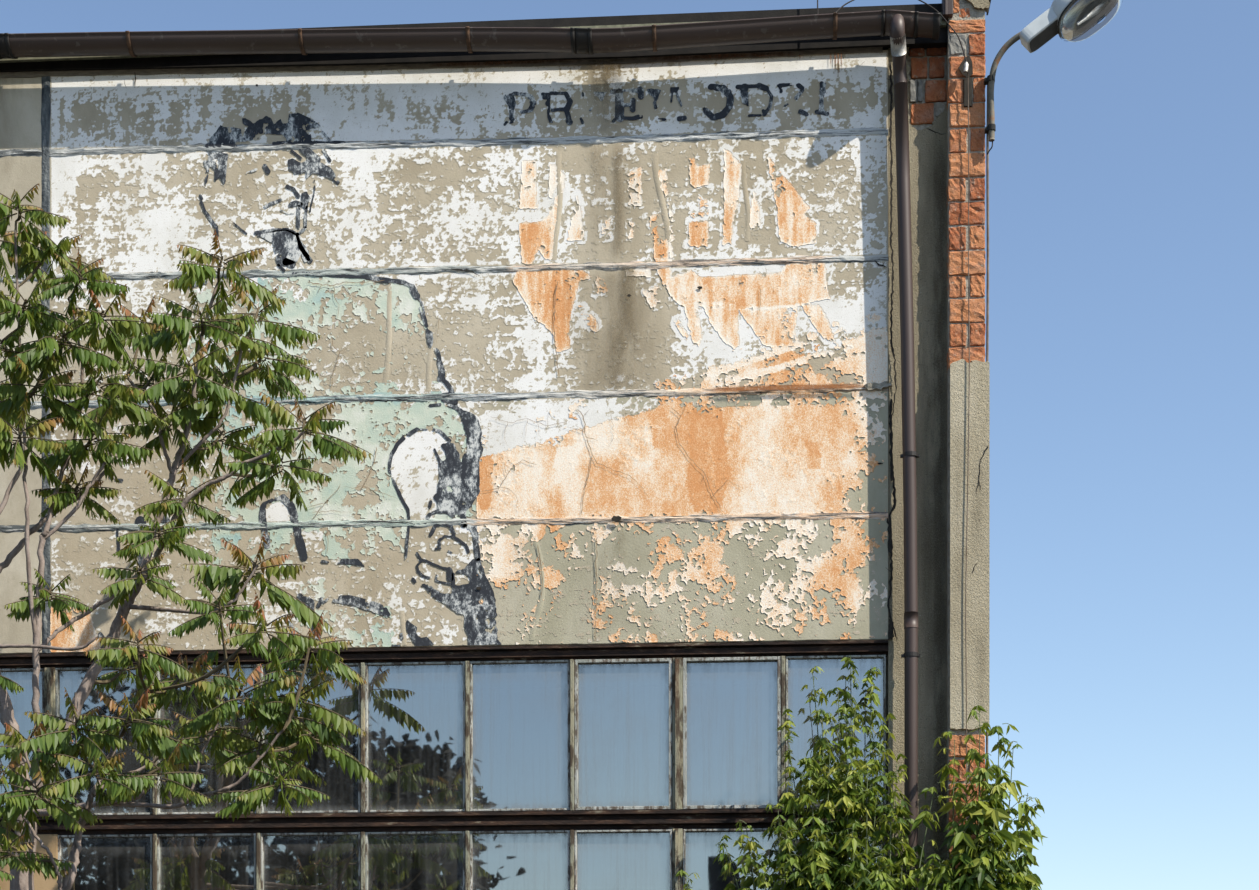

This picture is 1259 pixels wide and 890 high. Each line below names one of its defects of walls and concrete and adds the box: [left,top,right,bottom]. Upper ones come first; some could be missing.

spalling [909,0,986,371]
peeling [50,51,888,652]
crack [481,409,648,639]
crack [673,404,742,511]
spalling [947,735,985,870]